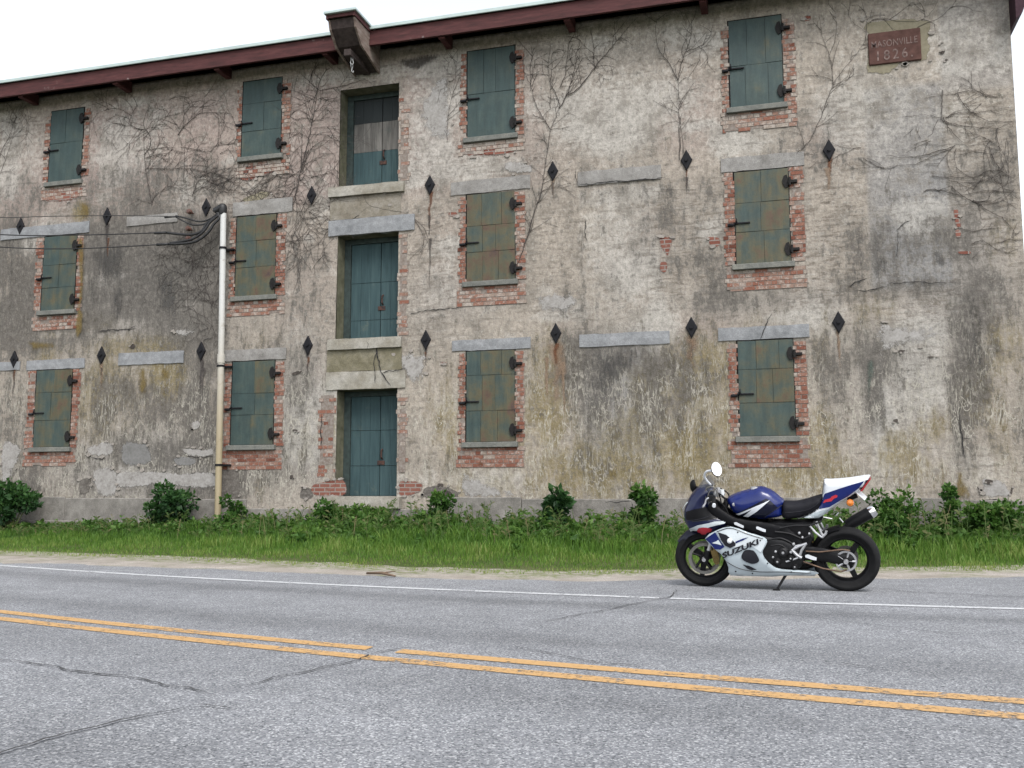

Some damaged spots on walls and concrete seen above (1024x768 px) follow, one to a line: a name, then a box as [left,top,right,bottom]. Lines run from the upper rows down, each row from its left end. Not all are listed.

peeling [860,18,948,74]
spalling [657,234,675,272]
crack [367,342,404,386]
peeling [77,441,241,499]
spalling [290,475,347,501]